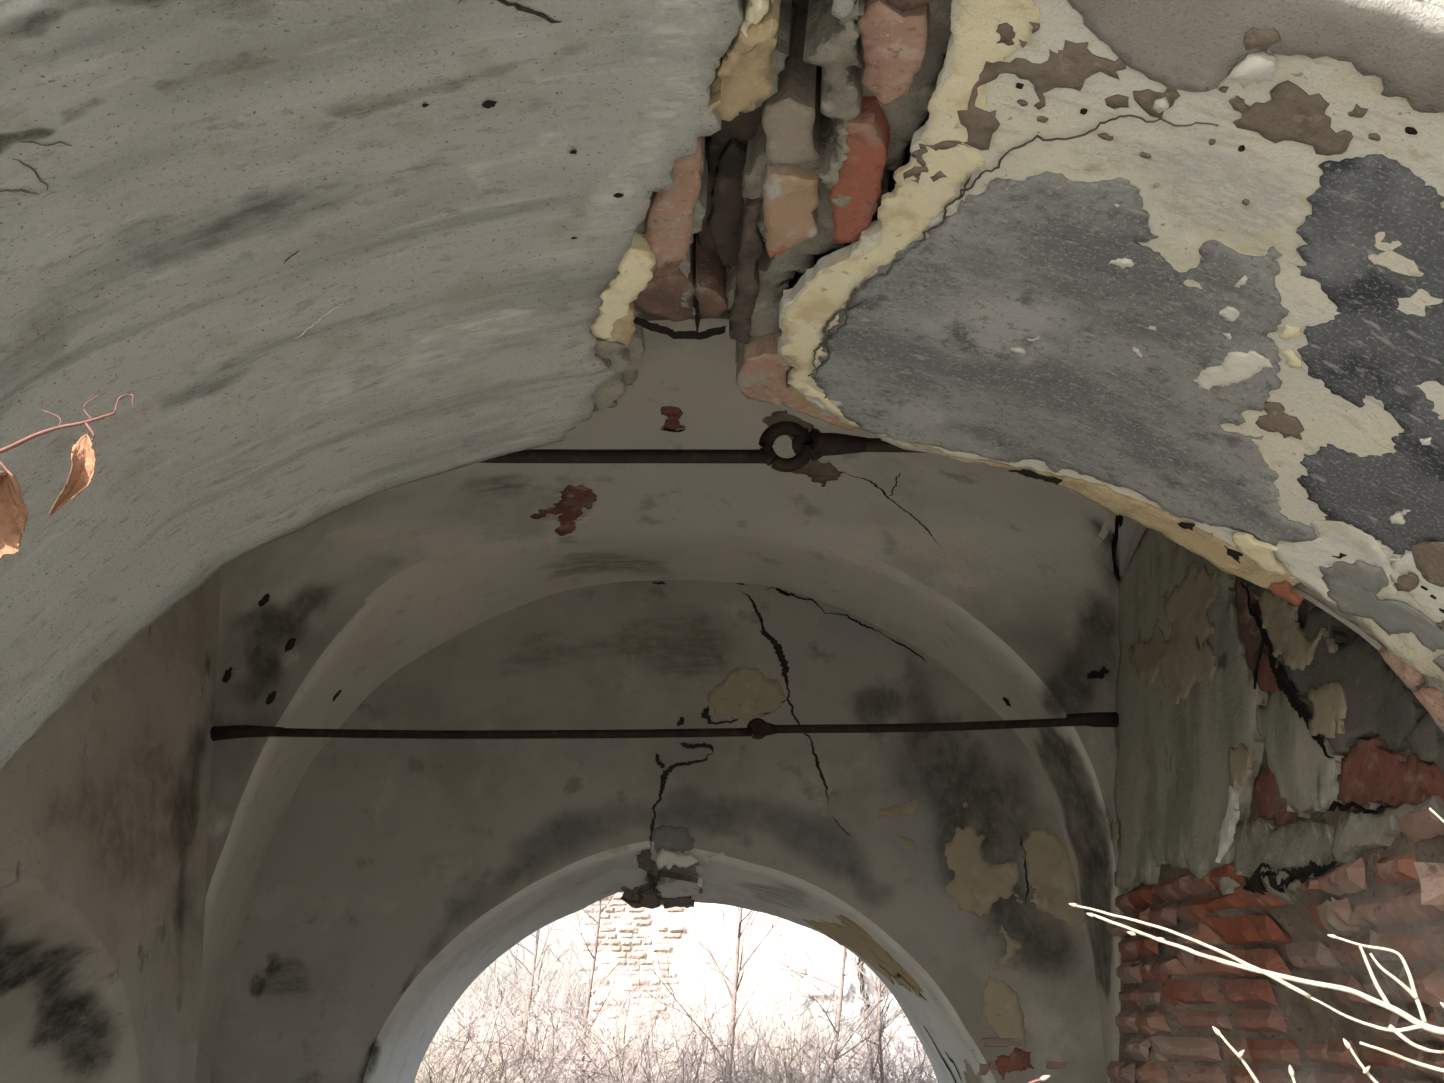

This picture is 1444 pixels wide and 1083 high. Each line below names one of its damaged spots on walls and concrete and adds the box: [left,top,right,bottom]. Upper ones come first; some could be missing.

crack [0,141,72,195]
crack [808,114,1218,379]
spalling [590,0,1444,487]
spalling [881,435,1444,729]
water stain [0,927,107,1068]
crack [649,583,926,848]
spalling [802,915,923,998]
water stain [923,748,1019,864]
flaking render [944,826,1085,928]
water stain [991,885,1067,966]
water stain [1040,727,1111,992]
flaking render [1104,681,1444,1083]